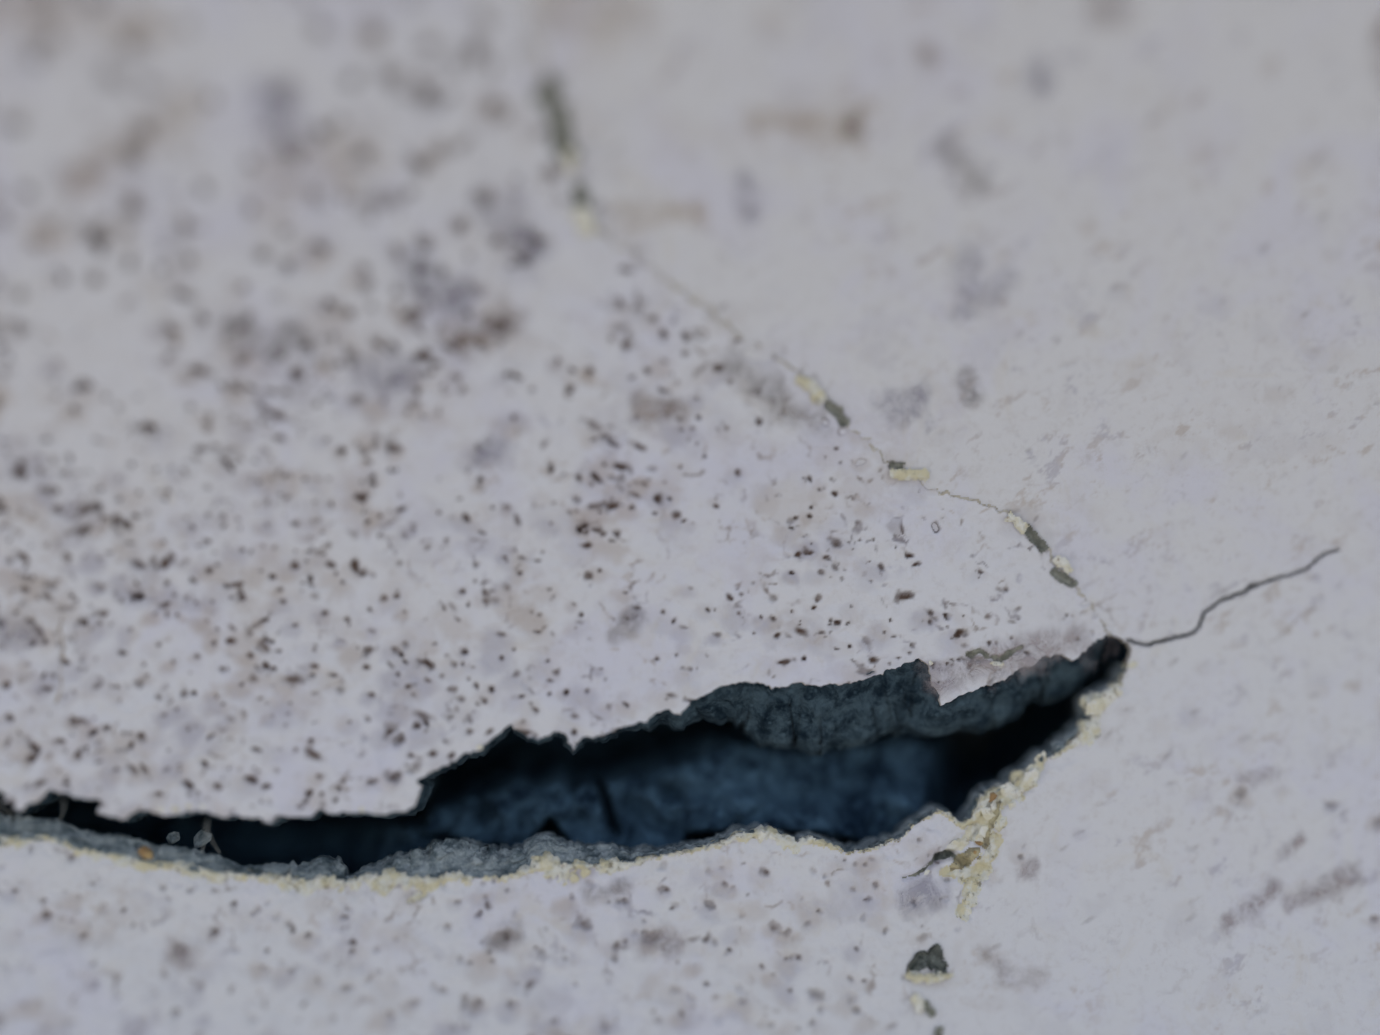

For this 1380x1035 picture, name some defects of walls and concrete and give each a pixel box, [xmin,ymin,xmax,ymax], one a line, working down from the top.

peeling [965,645,1024,668]
spalling [924,751,1048,922]